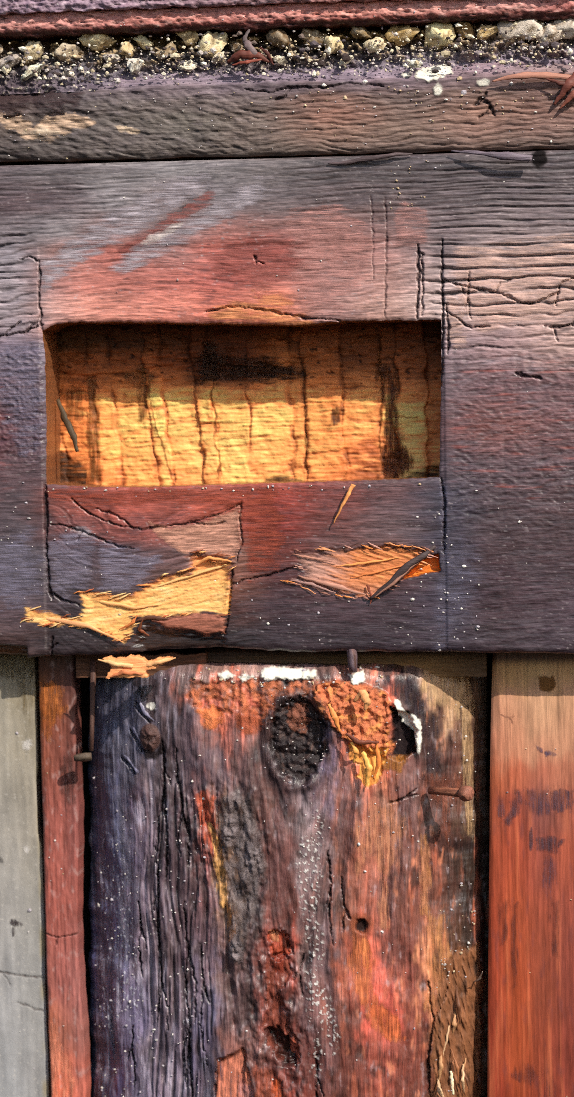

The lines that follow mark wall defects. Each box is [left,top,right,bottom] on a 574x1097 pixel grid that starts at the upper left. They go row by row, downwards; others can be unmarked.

crack [416,249,574,377]
peeling [153,509,242,557]
peeling [151,613,226,637]
crack [139,756,207,1097]